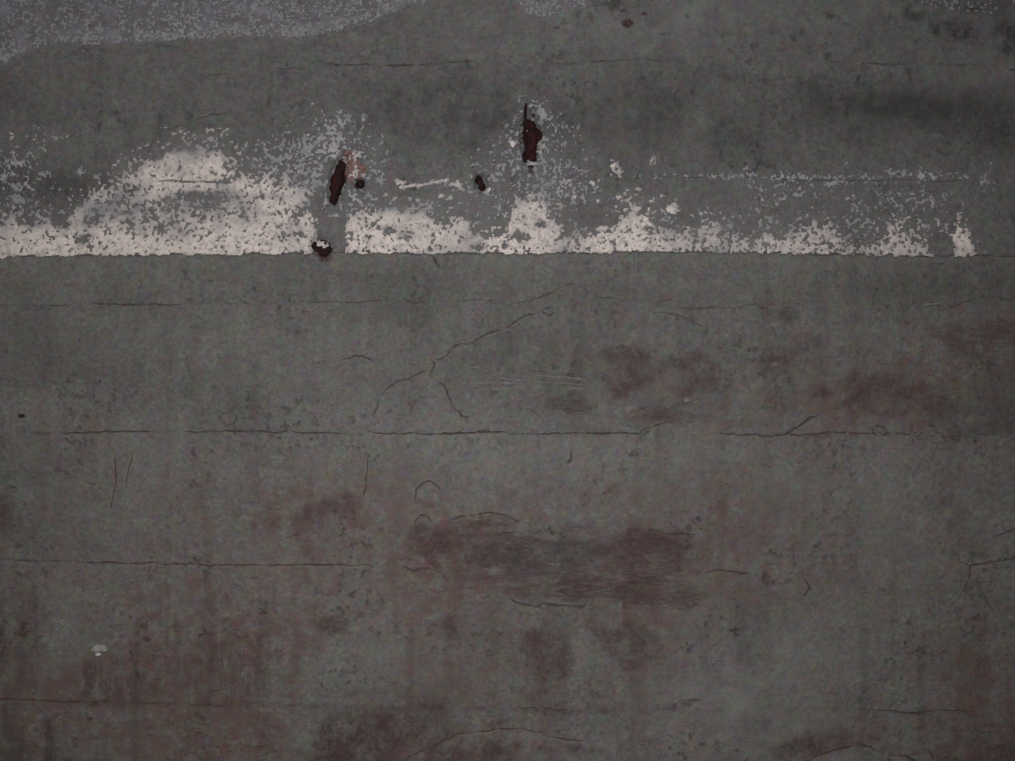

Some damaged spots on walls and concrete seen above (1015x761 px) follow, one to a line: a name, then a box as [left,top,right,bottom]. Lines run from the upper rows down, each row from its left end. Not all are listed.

damp [0,154,52,209]
damp [241,103,390,217]
damp [468,95,602,220]
damp [639,161,996,238]
crack [0,301,178,309]
crack [373,283,693,463]
crack [27,430,154,507]
crack [184,428,345,436]
crack [723,415,961,444]
crack [955,553,1015,626]
crack [797,744,934,761]